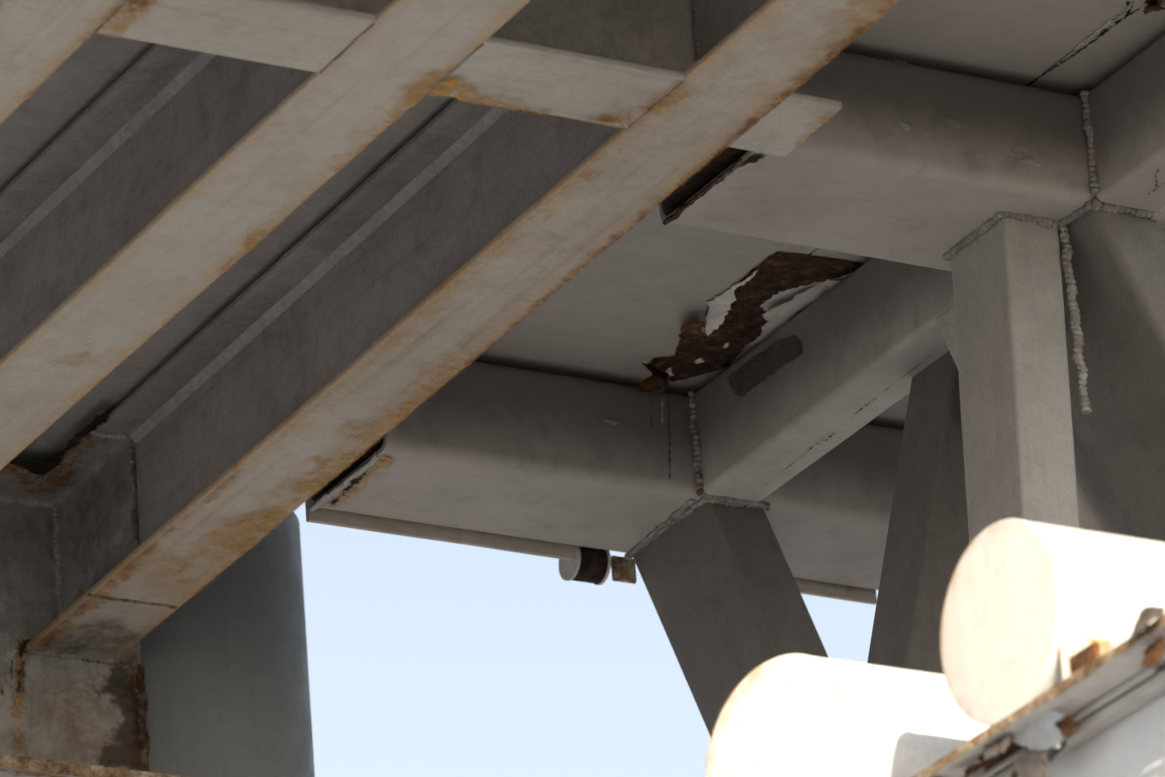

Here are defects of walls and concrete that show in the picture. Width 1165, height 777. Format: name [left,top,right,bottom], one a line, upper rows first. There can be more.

spalling [1143,0,1165,15]
rust [405,73,548,114]
rust [739,155,764,167]
rust [646,252,863,382]
peeling [638,363,670,393]
peeling [728,336,802,396]
rust [294,355,481,507]
rust [13,527,173,747]
peeling [1127,606,1165,641]
peeling [1139,635,1165,669]
rust [99,657,146,770]
peeling [964,710,1080,777]